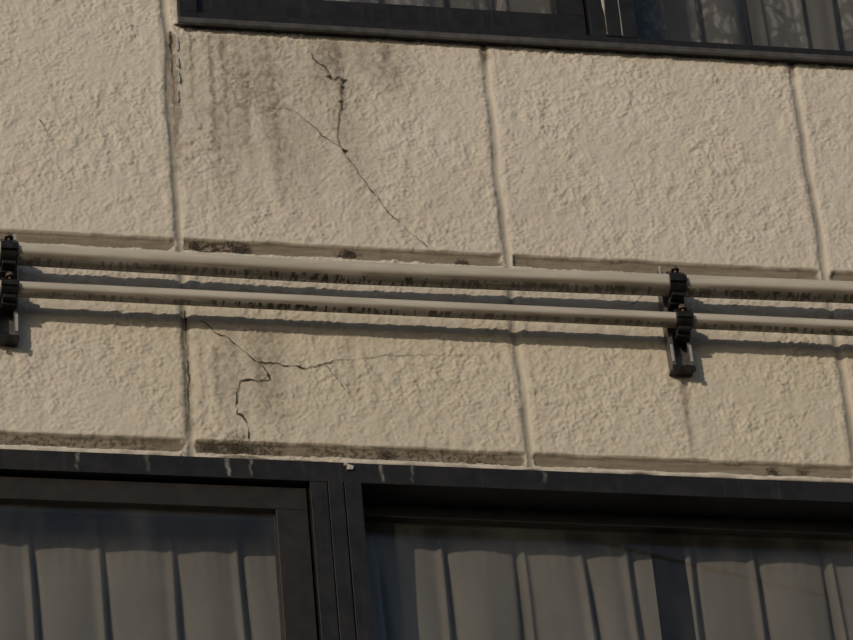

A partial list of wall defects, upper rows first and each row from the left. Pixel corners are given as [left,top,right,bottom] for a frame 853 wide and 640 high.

crack [304,54,397,219]
crack [184,311,448,439]